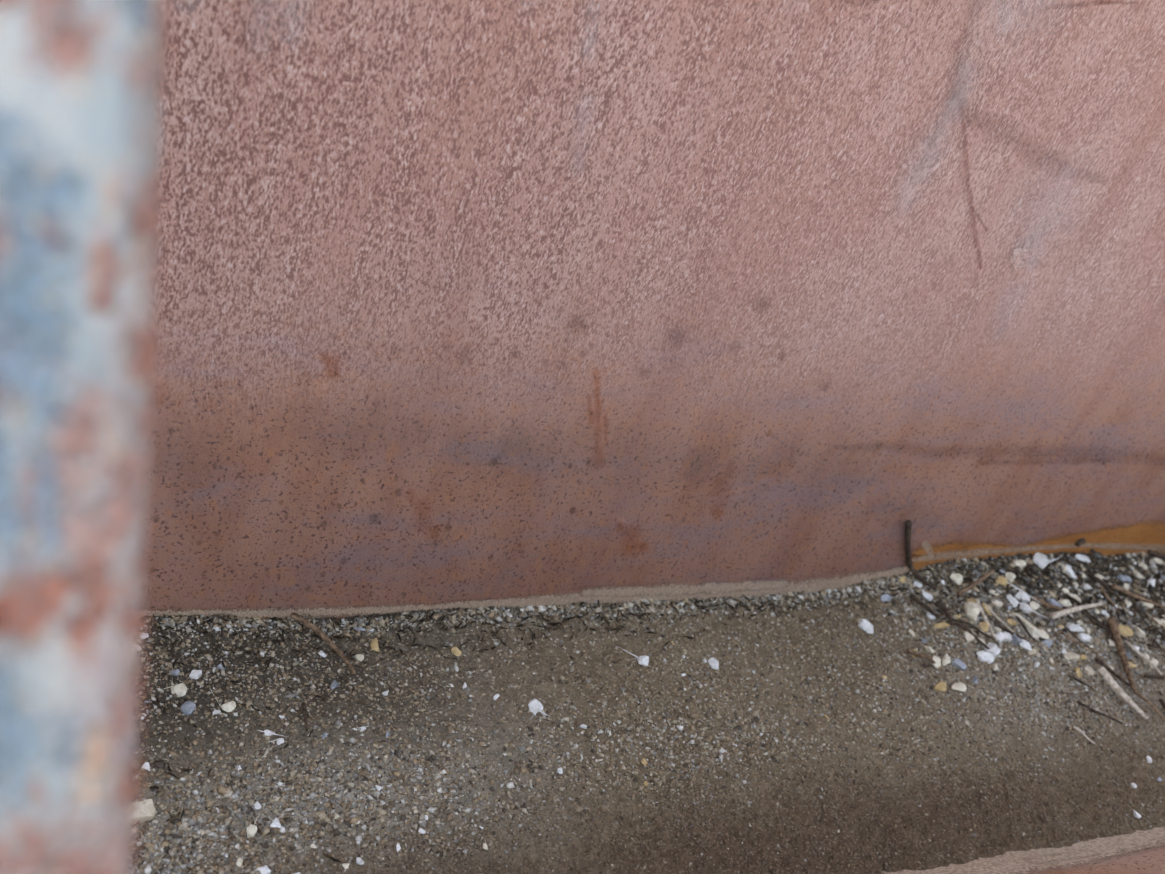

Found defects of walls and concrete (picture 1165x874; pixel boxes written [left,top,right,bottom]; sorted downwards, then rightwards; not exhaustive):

corrosion [912,522,1165,570]